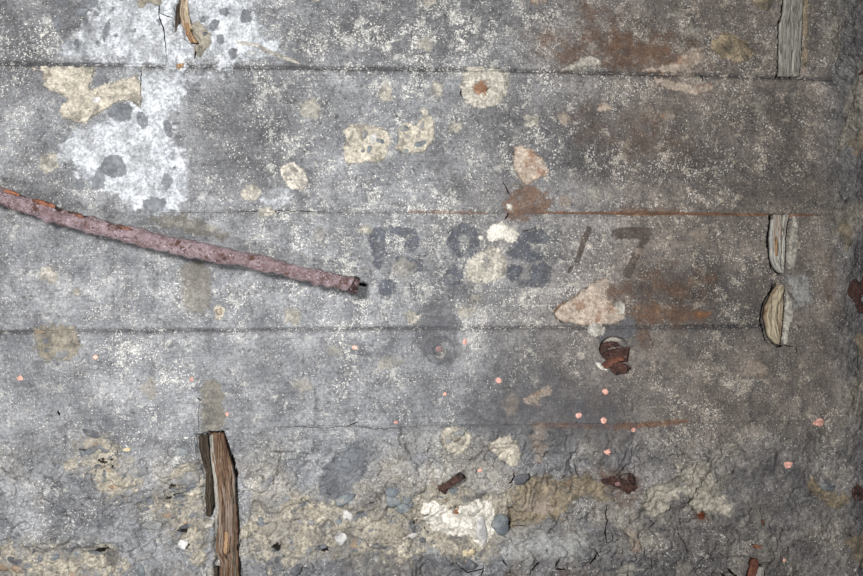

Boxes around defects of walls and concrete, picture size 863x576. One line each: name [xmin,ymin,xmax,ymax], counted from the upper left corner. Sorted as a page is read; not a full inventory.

corrosion [541,3,671,67]
peeling [75,155,127,189]
peeling [143,166,176,213]
corrosion [503,186,770,221]
corrosion [0,187,360,295]
crack [508,473,530,528]
crack [589,502,613,564]
crack [444,552,507,576]